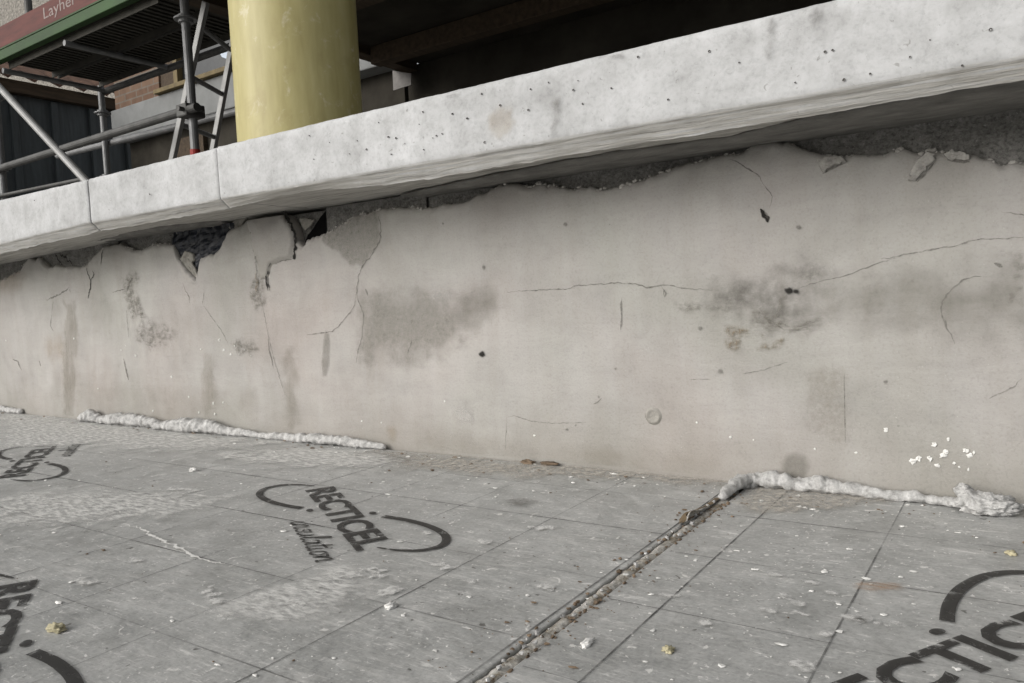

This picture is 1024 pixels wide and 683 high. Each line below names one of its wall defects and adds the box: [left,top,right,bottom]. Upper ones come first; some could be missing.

spalling [792,109,1024,181]
spalling [323,149,749,236]
spalling [0,259,28,280]
spalling [41,218,248,277]
crack [281,211,326,261]